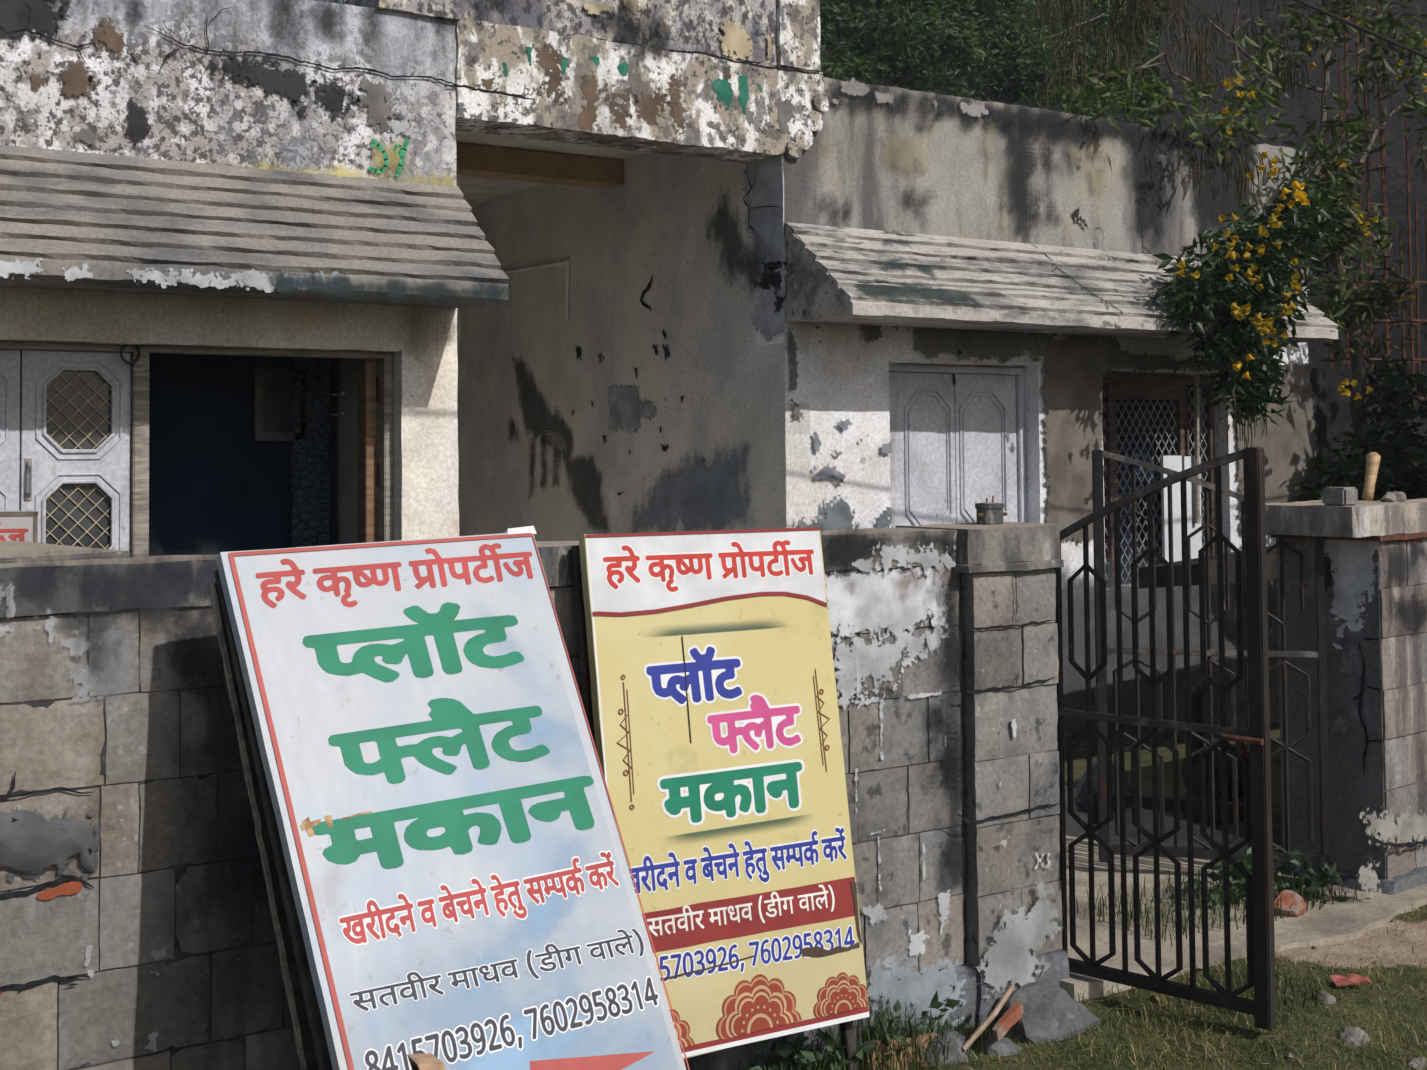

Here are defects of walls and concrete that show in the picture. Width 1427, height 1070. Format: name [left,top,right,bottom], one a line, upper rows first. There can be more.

peeling [526,43,721,135]
damp [828,83,1258,237]
peeling [126,267,348,293]
damp [509,358,608,533]
damp [632,446,749,533]
damp [1389,539,1427,634]
peeling [824,566,948,710]
crack [1353,638,1384,777]
crack [0,772,94,800]
crack [0,875,94,898]
crack [0,974,89,992]
peeling [862,869,1062,1041]